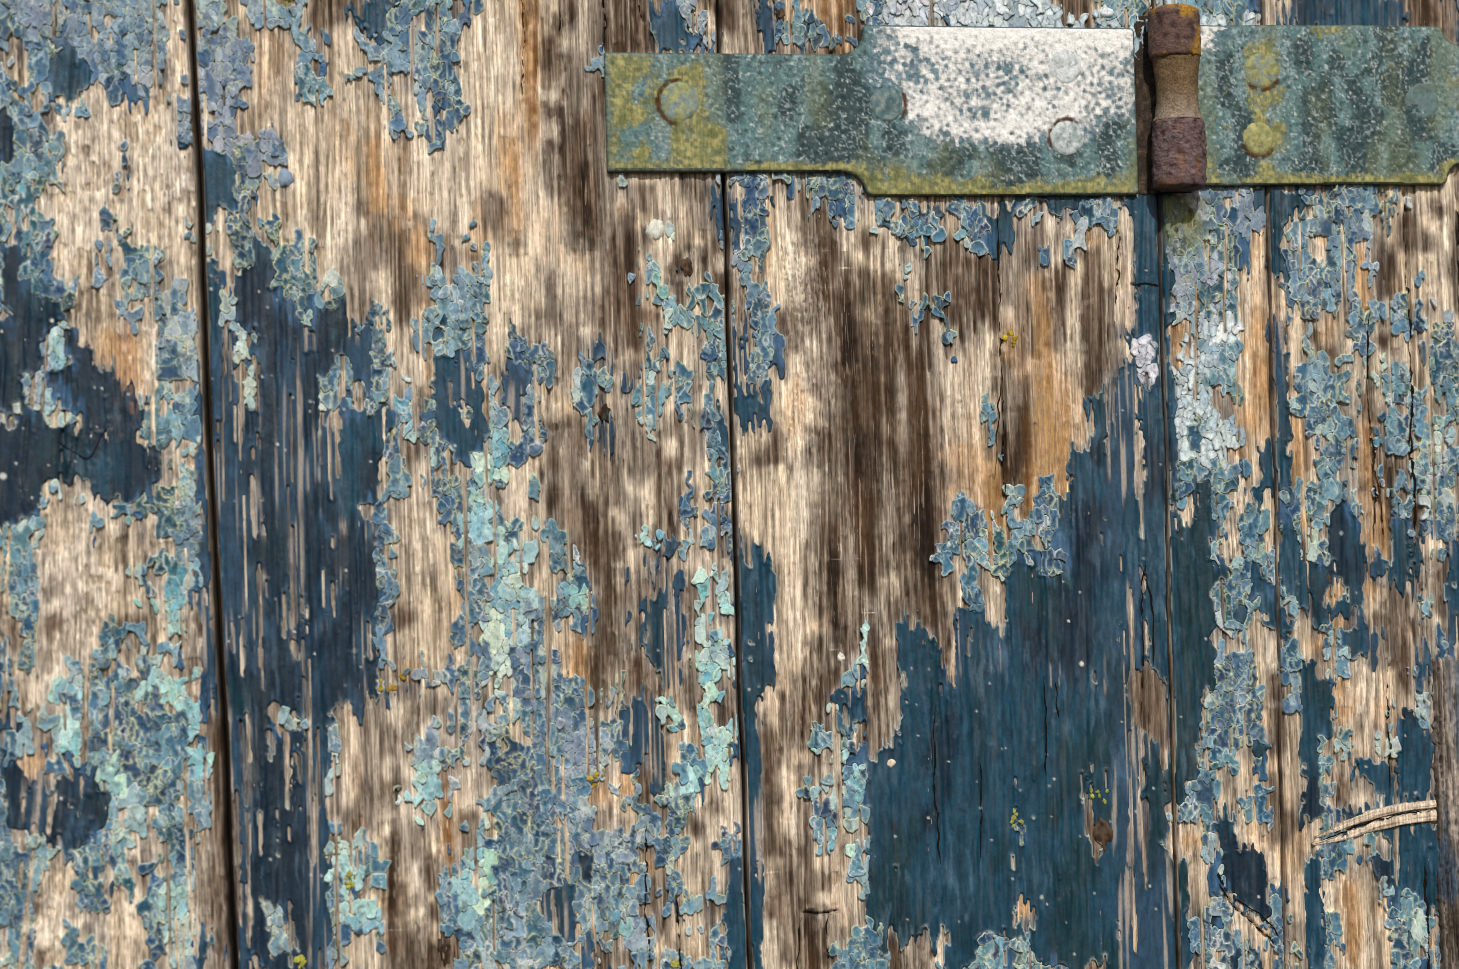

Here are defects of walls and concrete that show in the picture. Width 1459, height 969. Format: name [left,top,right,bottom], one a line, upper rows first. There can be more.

peeling [754,0,1410,60]
peeling [0,0,865,969]
peeling [795,184,1459,969]